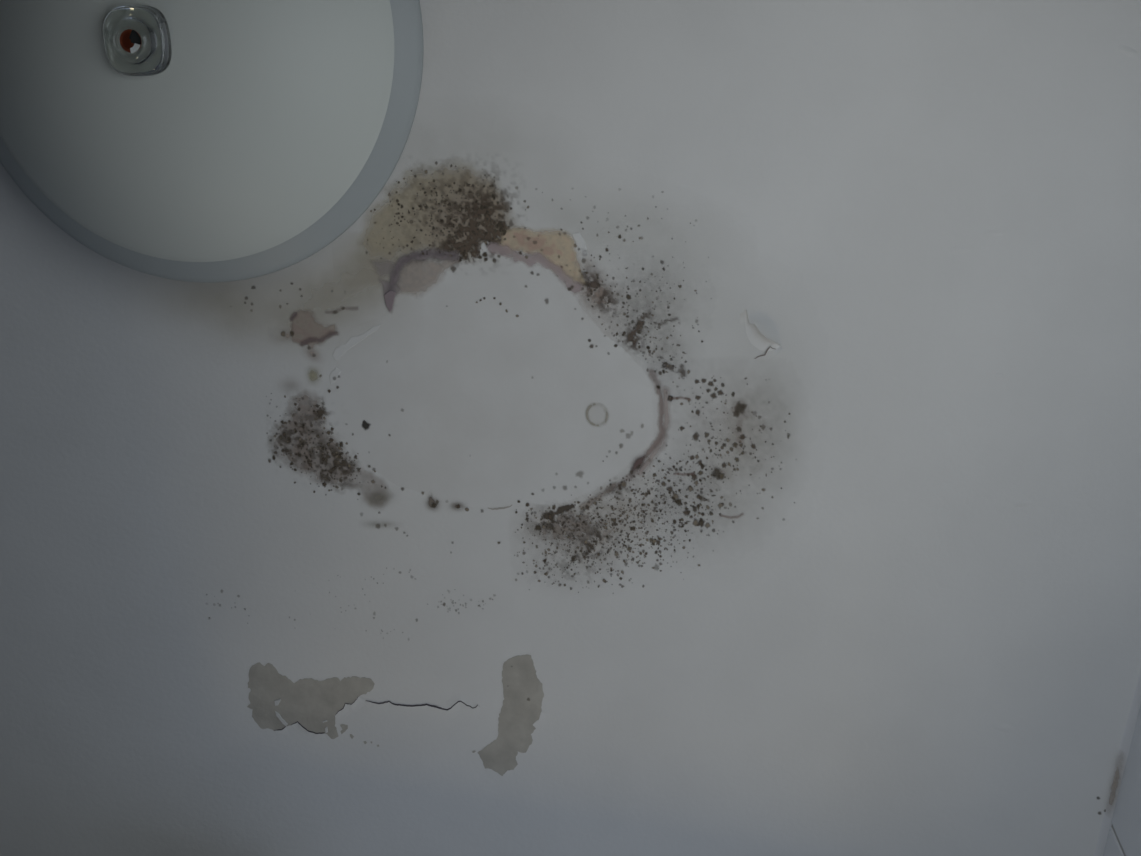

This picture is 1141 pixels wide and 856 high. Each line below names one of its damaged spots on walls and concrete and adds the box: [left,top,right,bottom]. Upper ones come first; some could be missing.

leakage [366,165,512,271]
peeling [738,310,783,360]
leakage [267,386,383,501]
leakage [514,248,782,593]
peeling [247,662,379,747]
crack [365,693,484,719]
peeling [472,655,549,784]